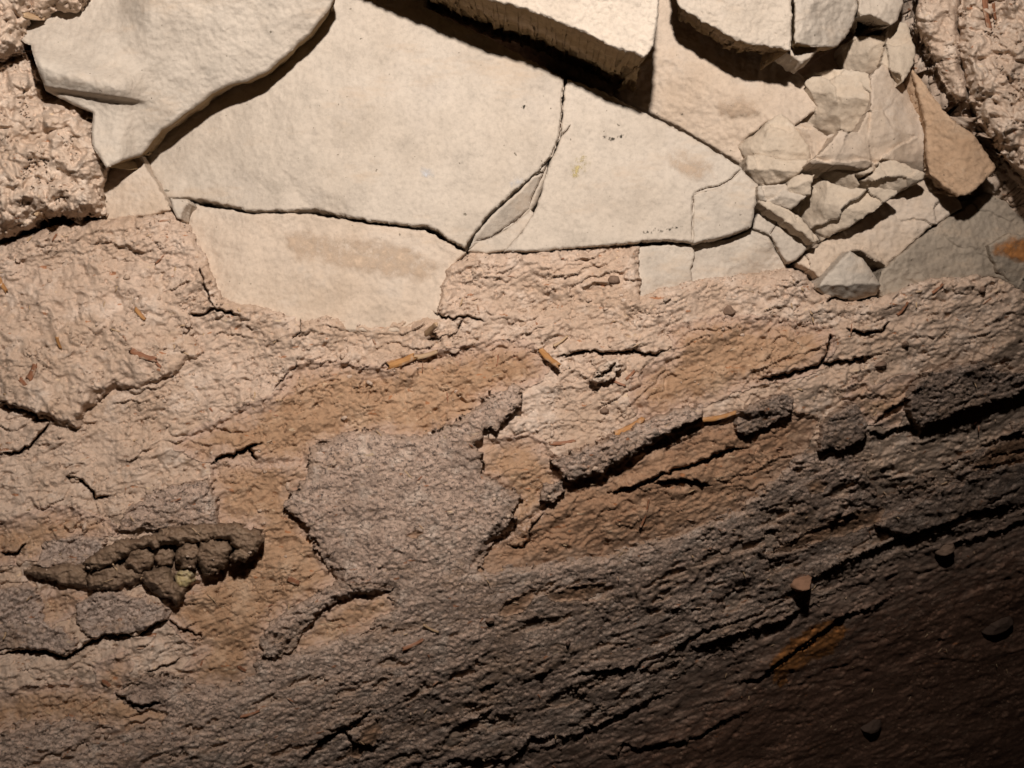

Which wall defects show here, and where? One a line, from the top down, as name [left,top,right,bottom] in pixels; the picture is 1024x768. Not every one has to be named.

crack [477,83,570,241]
crack [691,172,738,240]
crack [192,269,237,316]
crack [561,348,670,378]
crack [759,324,887,380]
crack [0,401,50,455]
crack [213,443,261,463]
crack [614,447,743,493]
crack [870,402,912,438]
flaking render [0,314,1024,768]
crack [533,486,1024,682]
crack [3,620,202,659]